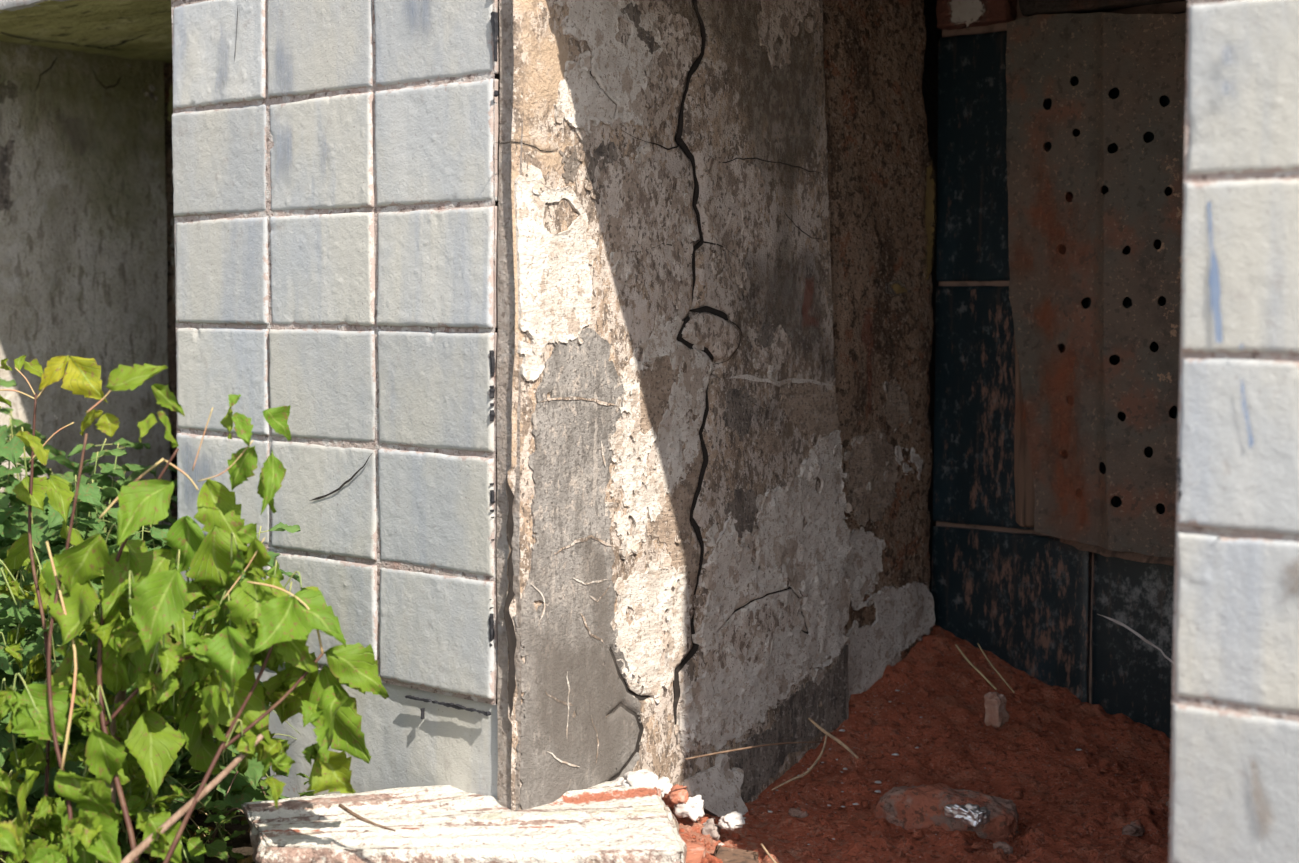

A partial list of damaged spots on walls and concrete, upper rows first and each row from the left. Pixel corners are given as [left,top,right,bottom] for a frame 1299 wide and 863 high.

spalling [0,75,21,104]
spalling [0,140,17,216]
crack [590,0,822,781]
peeling [514,0,935,817]
crack [309,452,373,501]